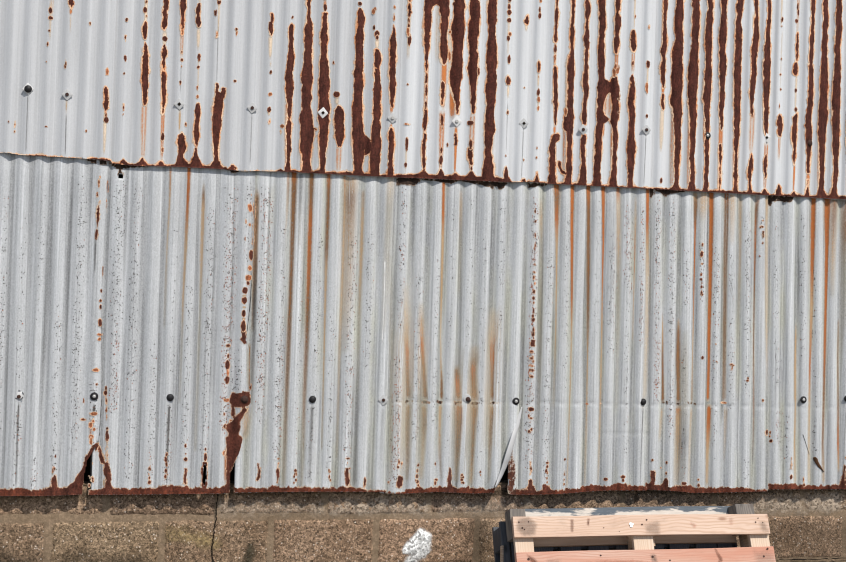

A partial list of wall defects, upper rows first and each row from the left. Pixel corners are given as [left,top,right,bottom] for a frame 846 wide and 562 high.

rust [0,0,239,311]
rust [0,194,495,496]
crack [210,494,218,562]